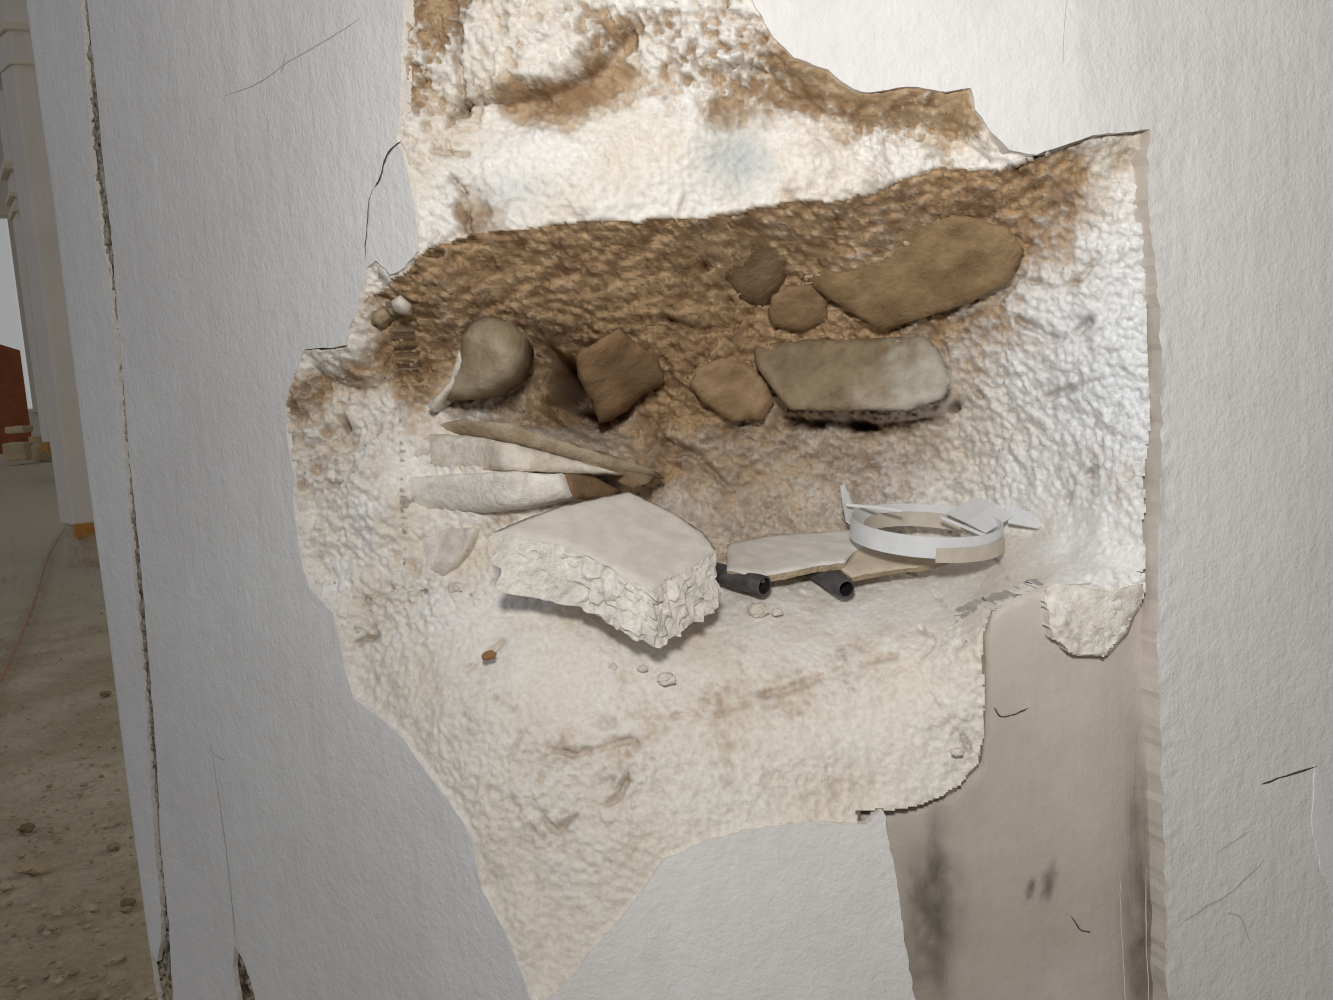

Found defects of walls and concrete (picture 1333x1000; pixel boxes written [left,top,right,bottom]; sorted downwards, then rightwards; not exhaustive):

crack [225,19,358,96]
crack [365,141,401,254]
crack [85,0,173,1000]
spalling [286,0,1151,1000]
crack [210,745,255,1000]